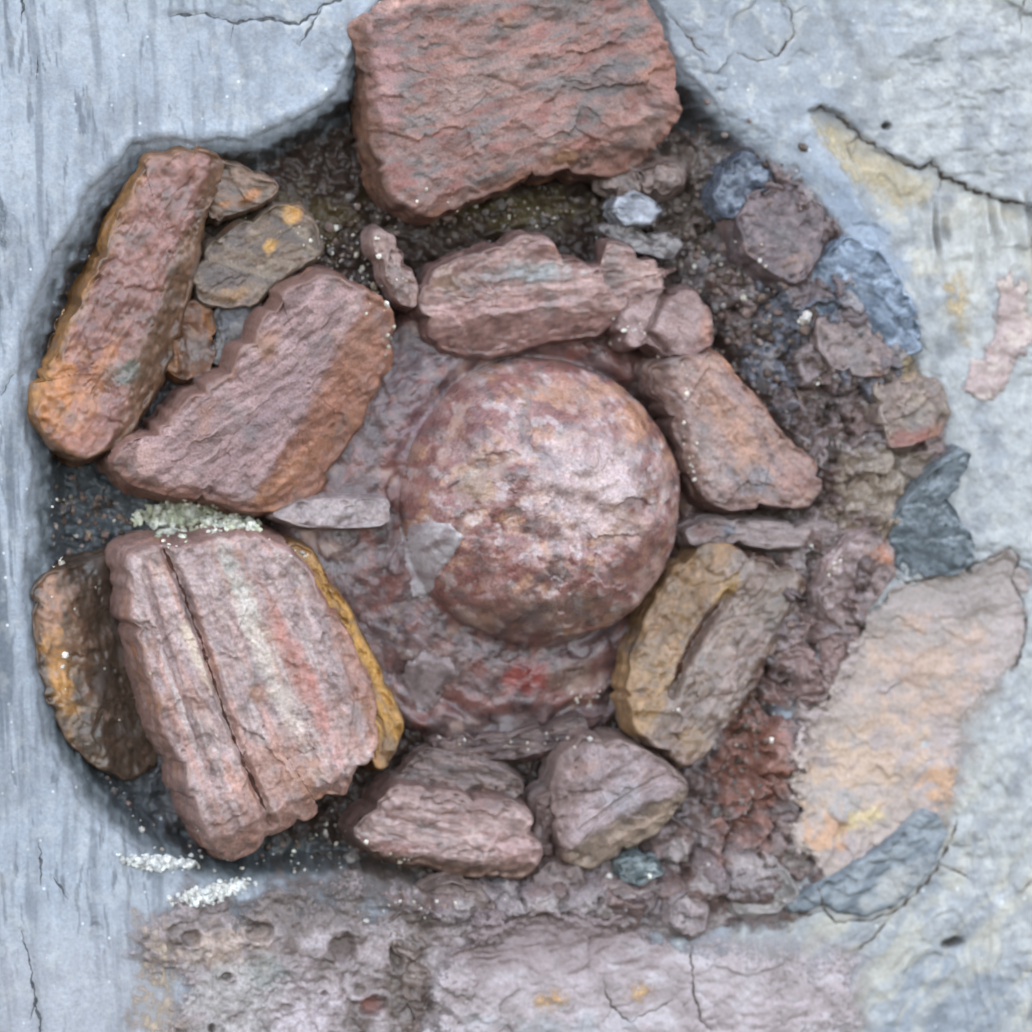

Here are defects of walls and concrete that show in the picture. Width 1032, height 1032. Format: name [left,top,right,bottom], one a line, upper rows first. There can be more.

crack [170,0,342,46]
peeling [592,153,688,261]
peeling [700,150,825,294]
crack [808,104,1032,207]
peeling [808,315,952,455]
spalling [727,443,1031,918]
peeling [130,779,864,1032]